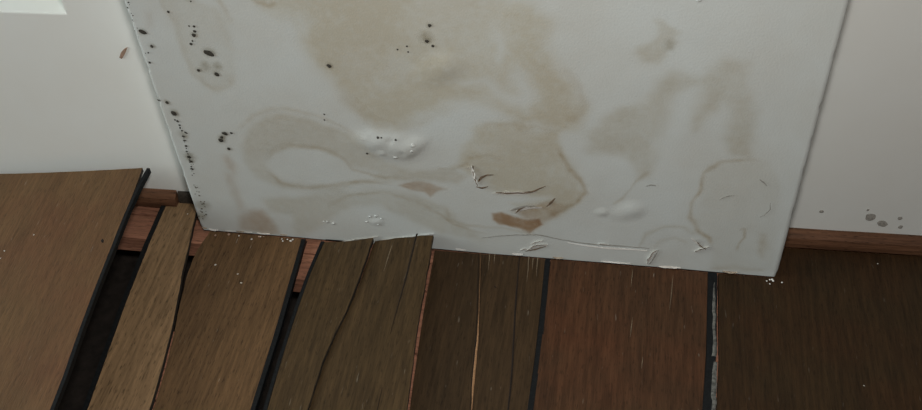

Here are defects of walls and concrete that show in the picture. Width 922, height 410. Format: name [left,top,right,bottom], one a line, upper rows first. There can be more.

leakage [157,99,207,219]
crack [390,234,418,333]
crack [469,174,649,410]